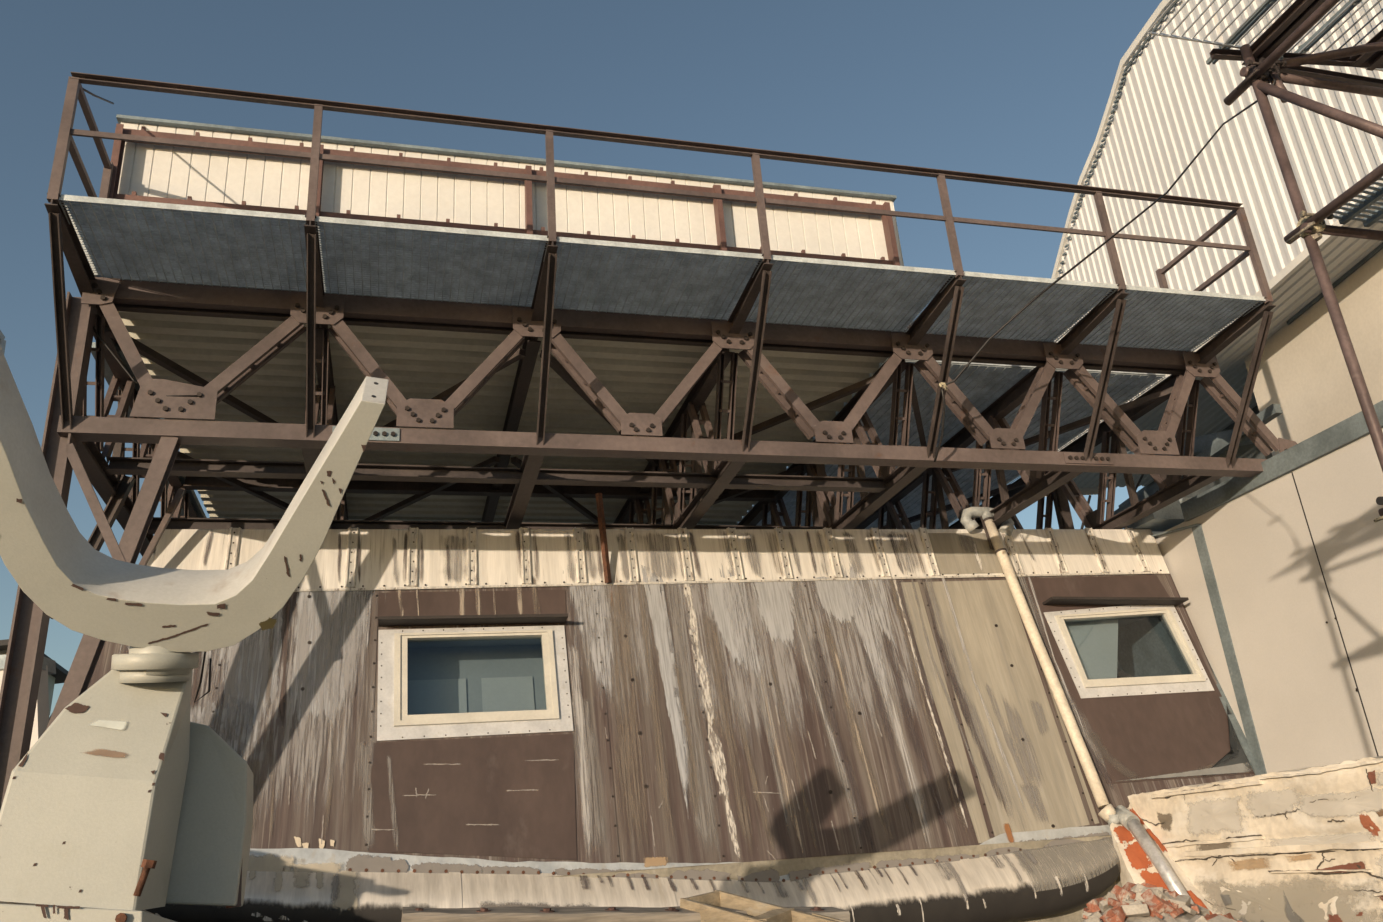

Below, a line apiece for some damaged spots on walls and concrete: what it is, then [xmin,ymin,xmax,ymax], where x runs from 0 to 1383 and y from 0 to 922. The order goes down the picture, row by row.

leakage [332,532,360,702]
leakage [393,533,423,616]
leakage [446,536,496,615]
leakage [252,597,291,788]
leakage [567,532,774,850]
leakage [724,531,890,848]
leakage [843,533,1036,832]
leakage [247,854,359,911]
leakage [830,865,917,891]
leakage [989,837,1120,898]
crack [1141,769,1383,893]
spalling [1328,912,1363,922]